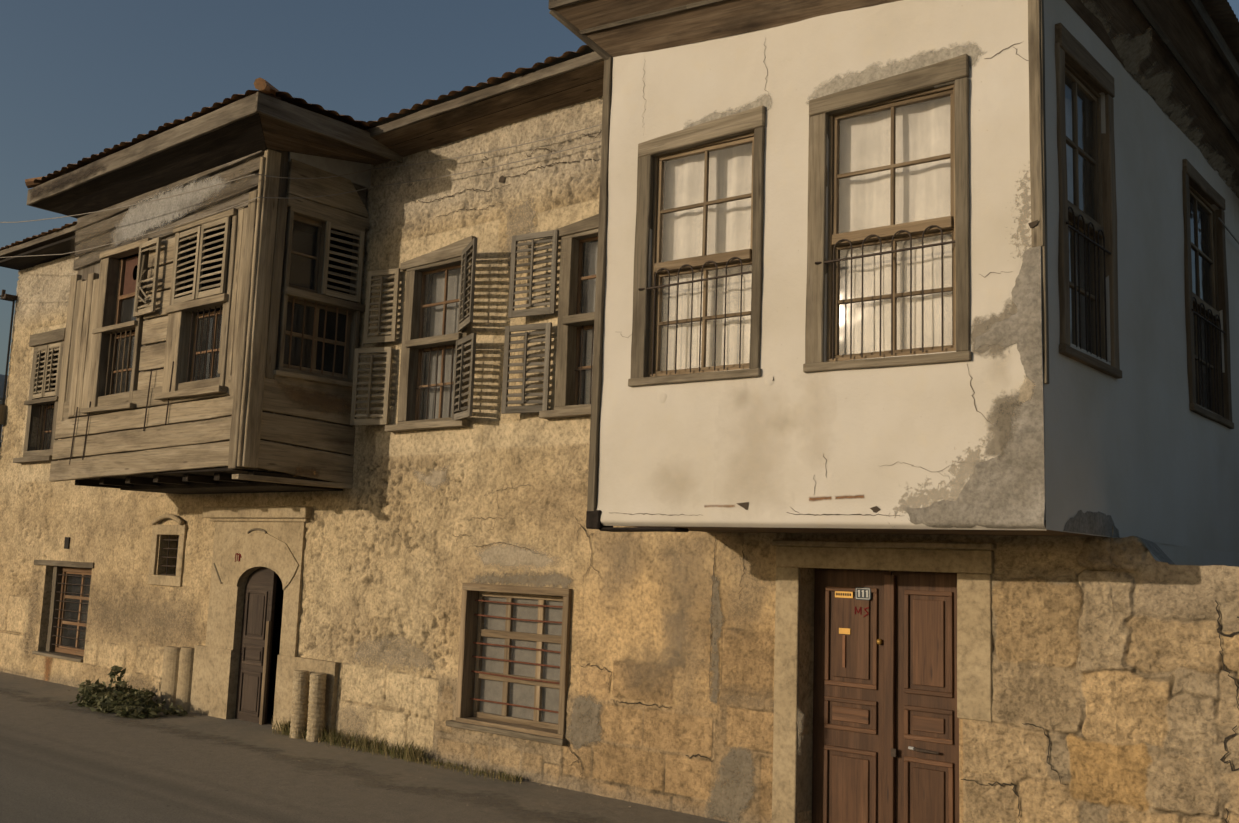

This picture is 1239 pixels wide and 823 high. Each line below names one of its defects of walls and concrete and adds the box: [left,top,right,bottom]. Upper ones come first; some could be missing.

crack [984,42,1029,61]
crack [413,130,602,217]
crack [575,517,602,583]
crack [580,664,670,709]